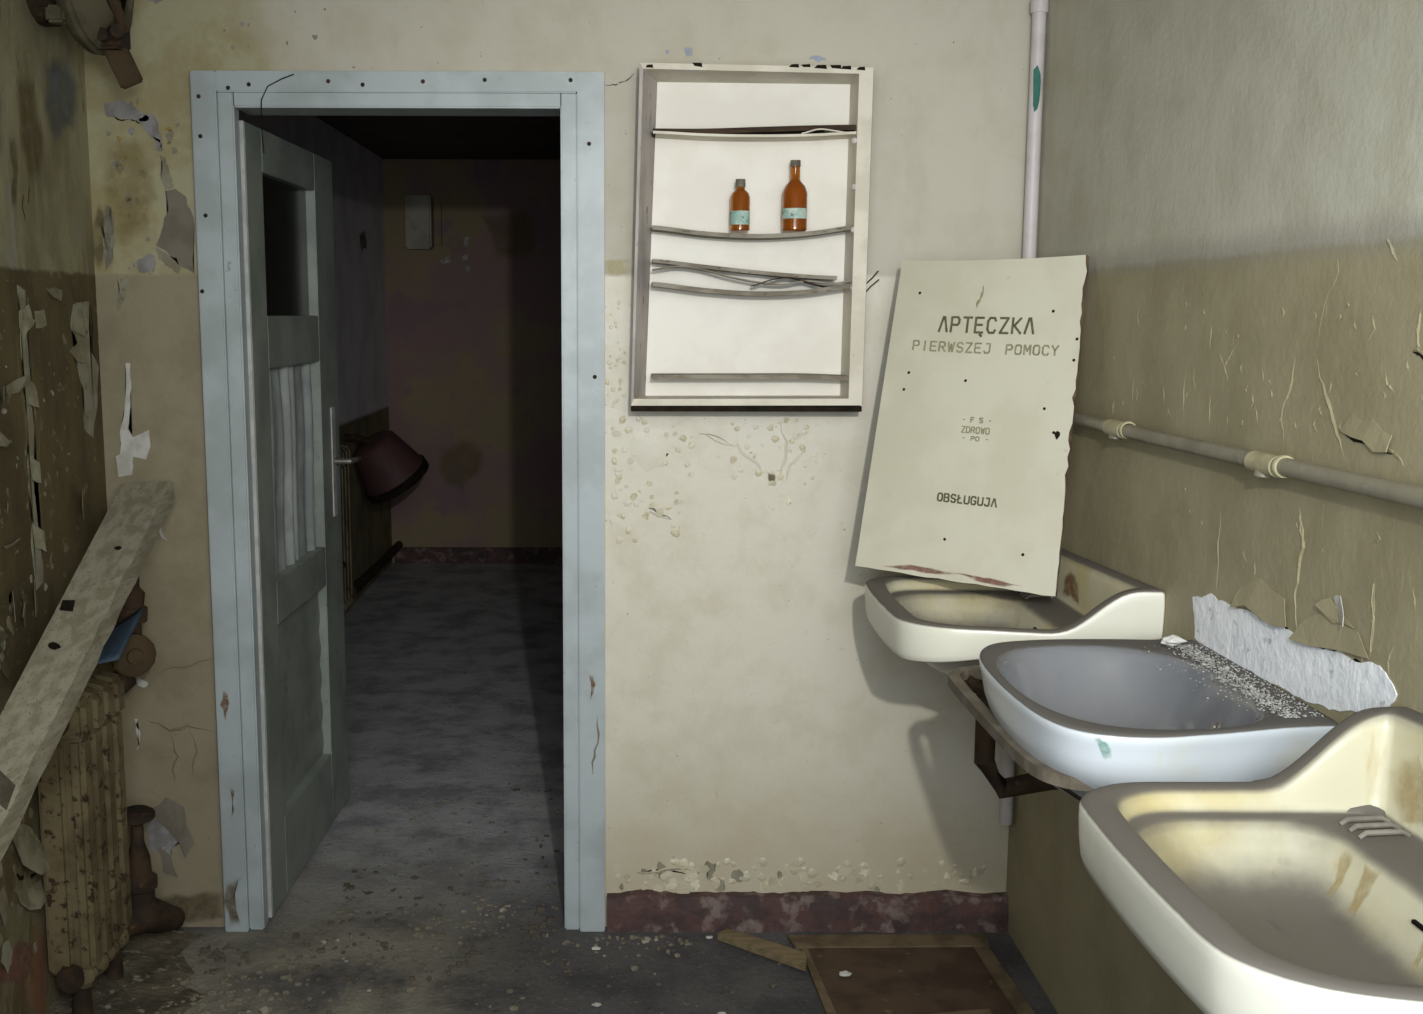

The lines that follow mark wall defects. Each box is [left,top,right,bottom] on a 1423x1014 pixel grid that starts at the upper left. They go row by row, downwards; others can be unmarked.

flaking render [100,99,195,312]
peeling [0,285,99,681]
peeling [116,363,151,477]
flaking render [1193,578,1397,712]
flaking render [640,861,743,894]